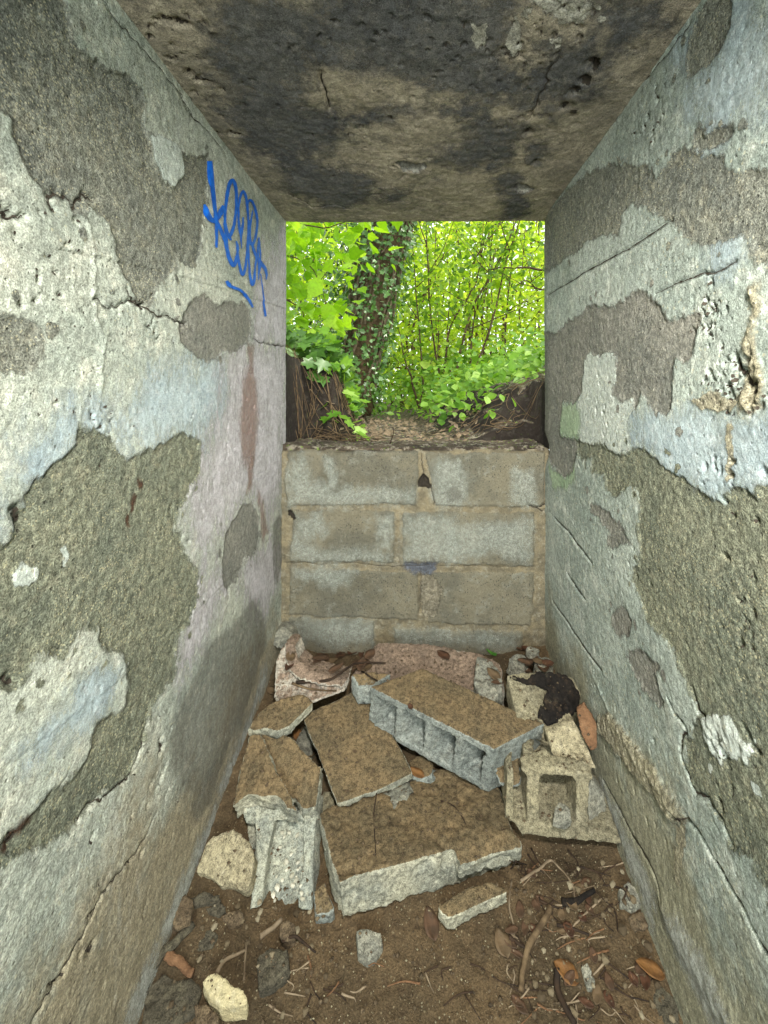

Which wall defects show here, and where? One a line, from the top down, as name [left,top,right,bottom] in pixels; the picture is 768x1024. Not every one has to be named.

crack [0,204,22,220]
crack [45,192,92,212]
spalling [0,0,209,340]
crack [94,289,183,324]
water stain [197,0,678,220]
spalling [544,118,768,275]
crack [656,262,735,294]
water stain [684,0,766,134]
water stain [711,235,741,279]
rust [242,352,256,487]
spalling [0,395,205,869]
spalling [544,279,768,888]